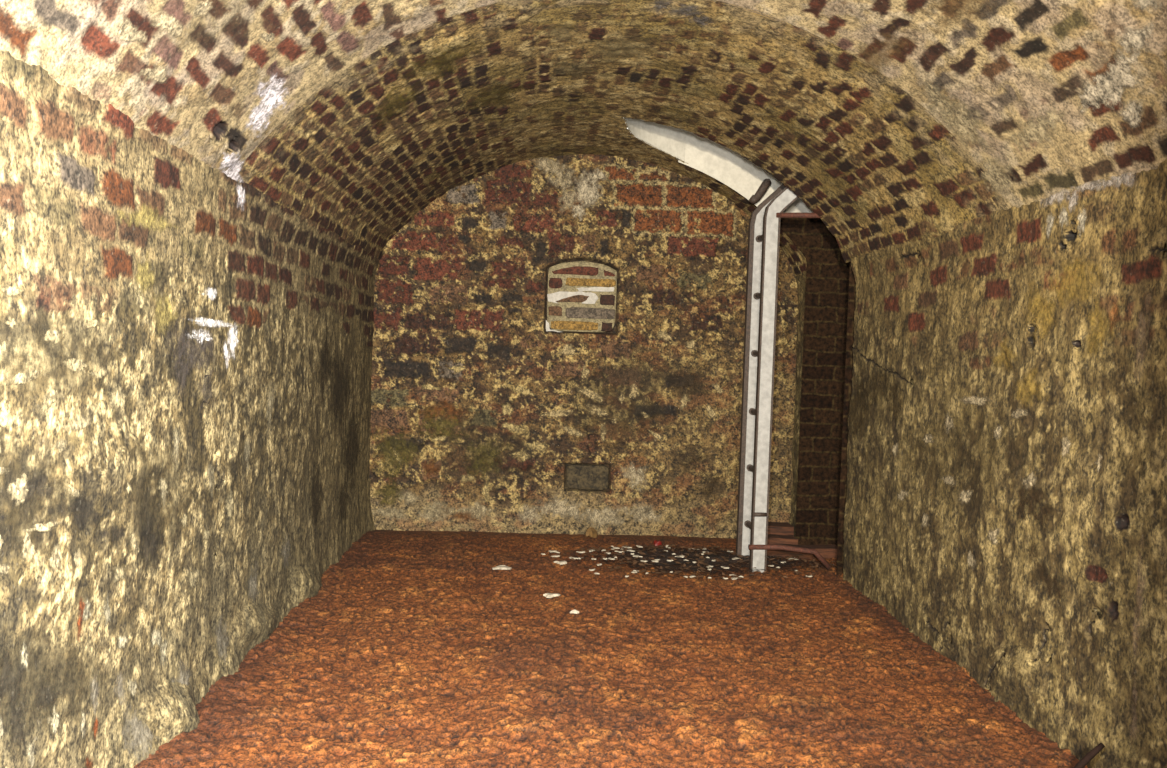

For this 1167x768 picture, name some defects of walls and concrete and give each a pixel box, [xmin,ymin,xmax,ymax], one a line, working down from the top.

damp [247,75,287,130]
damp [221,153,245,204]
damp [137,262,153,290]
damp [155,297,238,403]